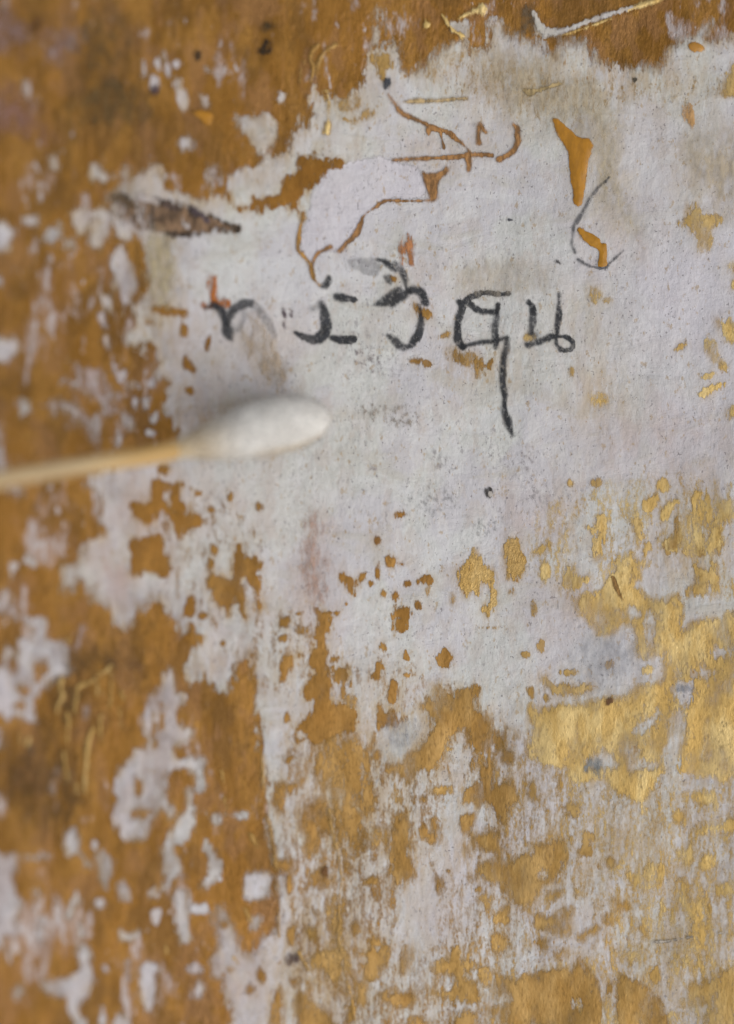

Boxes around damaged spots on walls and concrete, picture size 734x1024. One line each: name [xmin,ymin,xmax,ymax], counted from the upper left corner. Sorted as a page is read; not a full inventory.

peeling [143,51,211,112]
peeling [72,206,114,250]
spalling [106,191,242,239]
peeling [110,243,138,306]
peeling [0,553,85,749]
peeling [111,669,206,900]
peeling [0,851,24,962]
peeling [40,827,131,1024]
peeling [173,889,210,945]
peeling [199,838,223,890]
peeling [242,871,272,902]
peeling [126,961,160,1013]